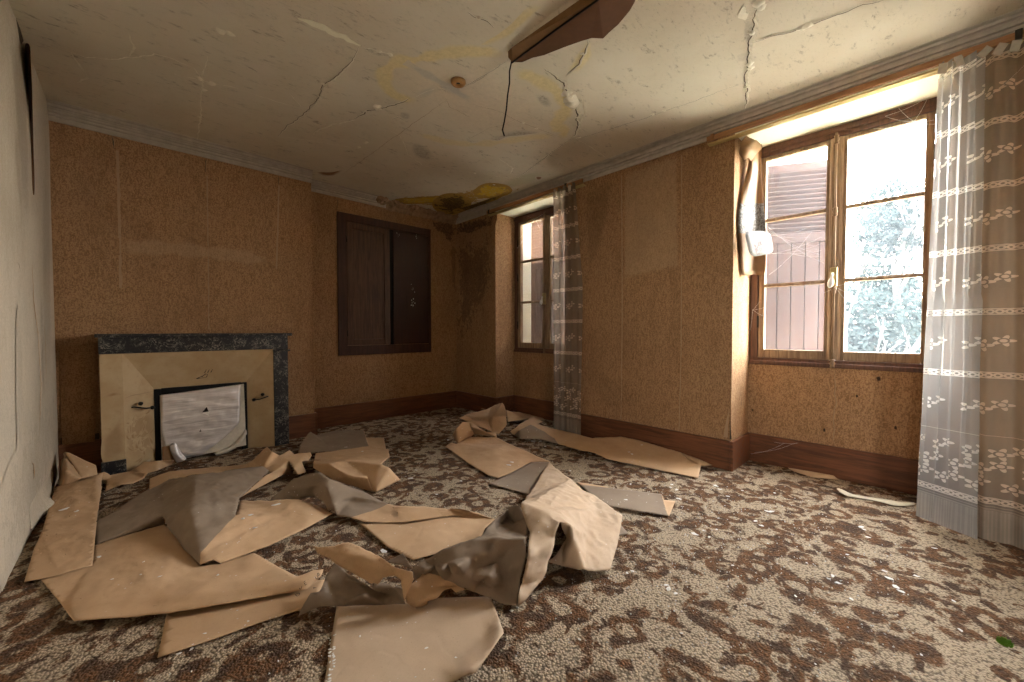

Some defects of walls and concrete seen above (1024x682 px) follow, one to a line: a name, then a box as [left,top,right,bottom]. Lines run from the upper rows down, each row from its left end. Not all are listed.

peeling [16,19,35,195]
damp [371,0,596,161]
crack [518,0,882,177]
damp [388,169,557,351]
peeling [738,136,773,276]